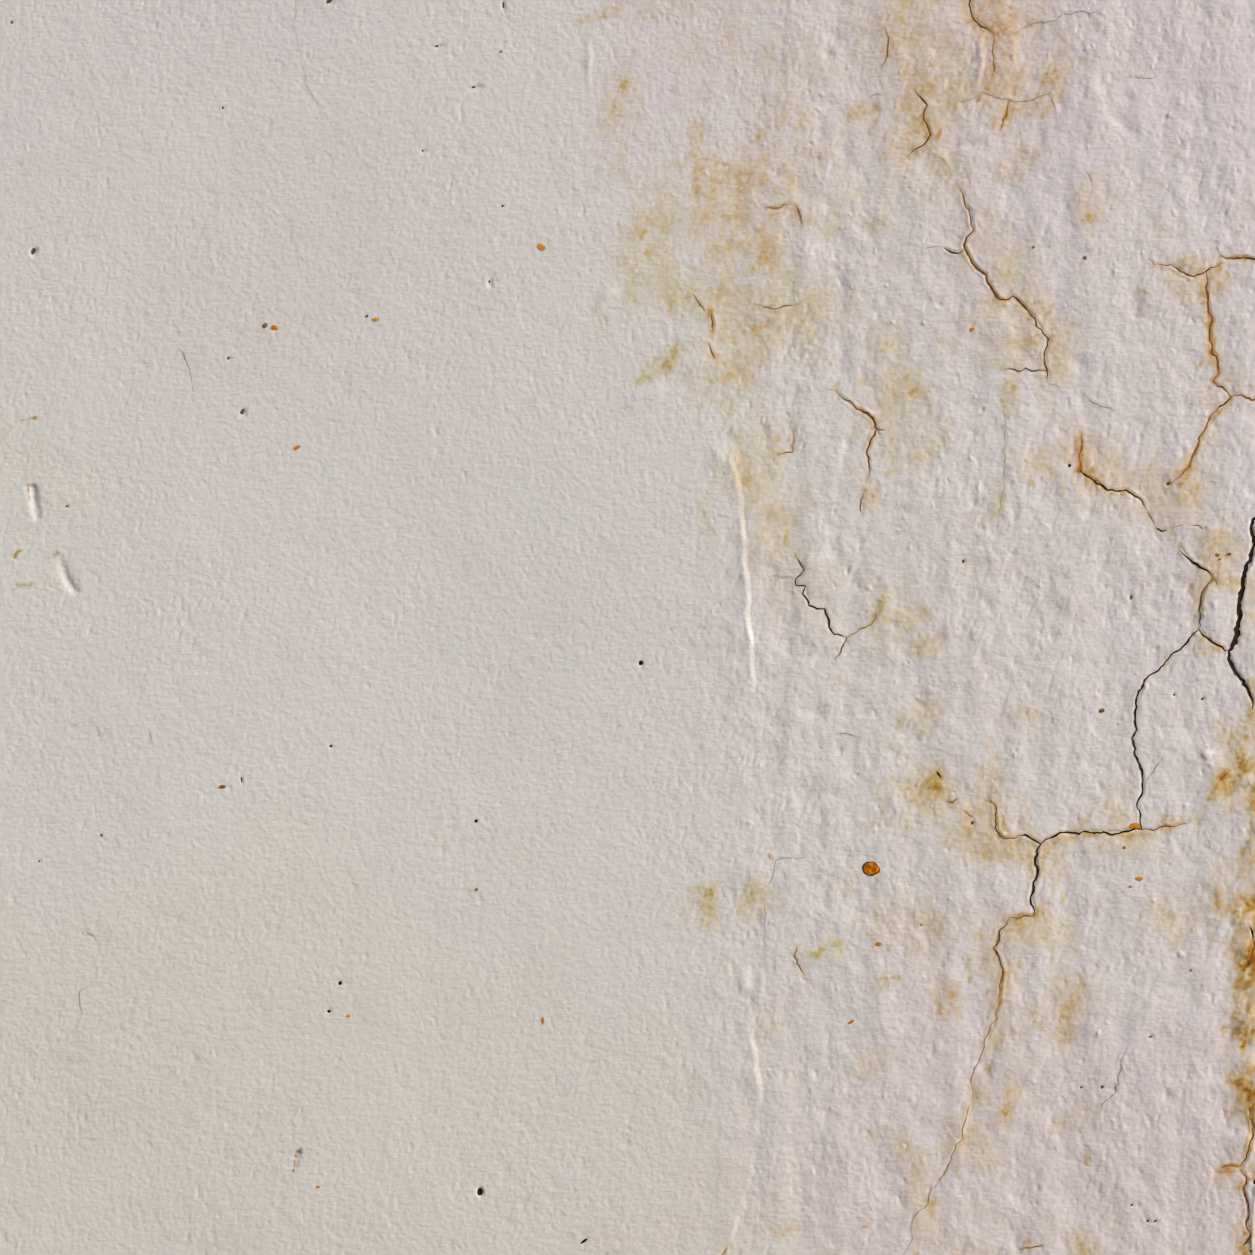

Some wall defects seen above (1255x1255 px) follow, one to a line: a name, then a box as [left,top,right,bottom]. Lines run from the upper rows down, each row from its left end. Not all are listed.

crack [908,0,1114,412]
crack [1150,241,1255,484]
crack [829,389,884,514]
crack [998,406,1007,524]
crack [770,560,876,660]
rust [863,862,880,876]
crack [904,437,1255,1254]